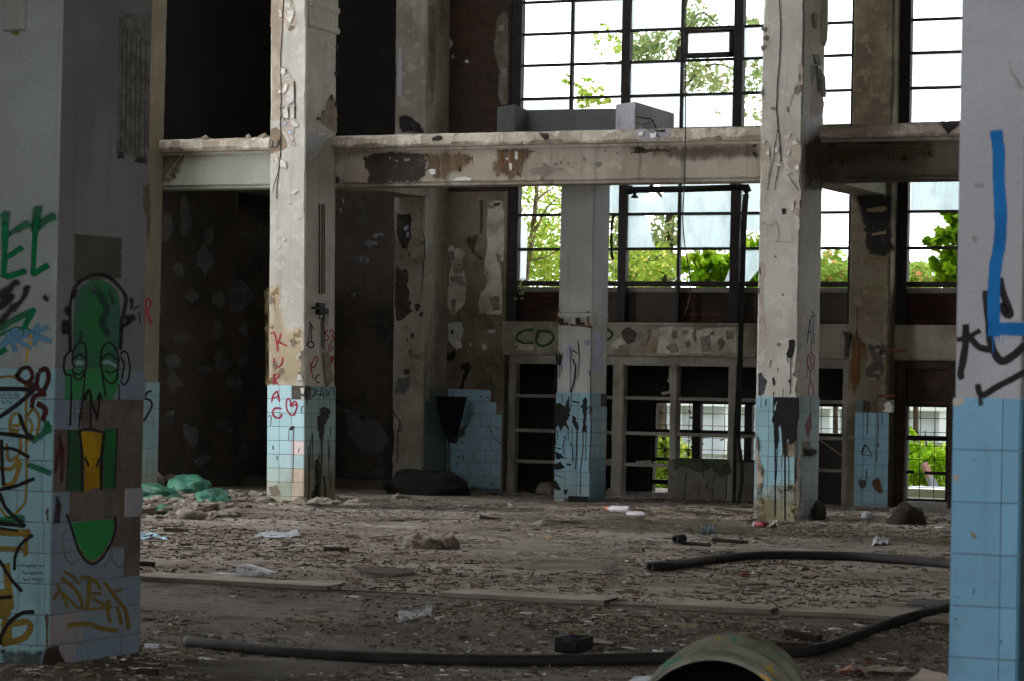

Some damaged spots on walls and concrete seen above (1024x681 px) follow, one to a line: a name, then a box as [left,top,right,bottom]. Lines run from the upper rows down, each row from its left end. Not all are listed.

spalling [268,0,337,169]
flaking render [363,152,435,184]